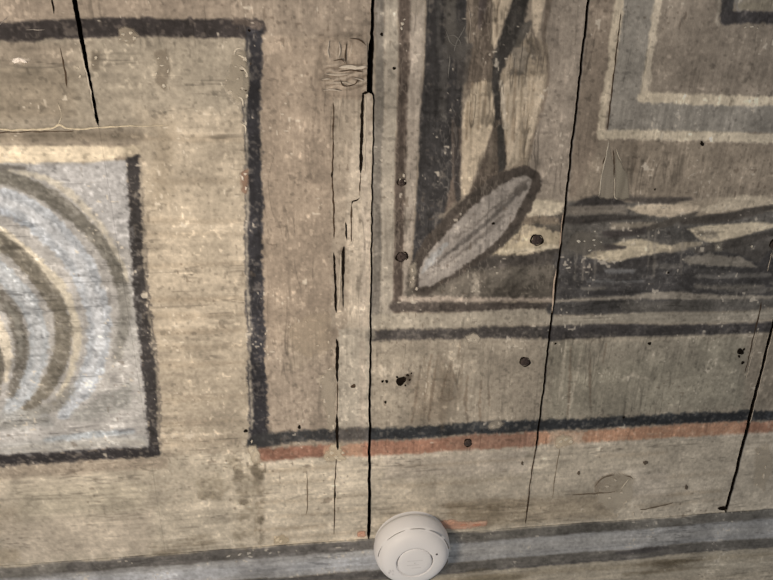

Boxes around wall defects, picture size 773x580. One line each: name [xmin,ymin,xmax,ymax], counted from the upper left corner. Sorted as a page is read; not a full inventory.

crack [0,0,169,133]
crack [331,0,375,535]
crack [525,0,589,523]
crack [718,305,773,510]